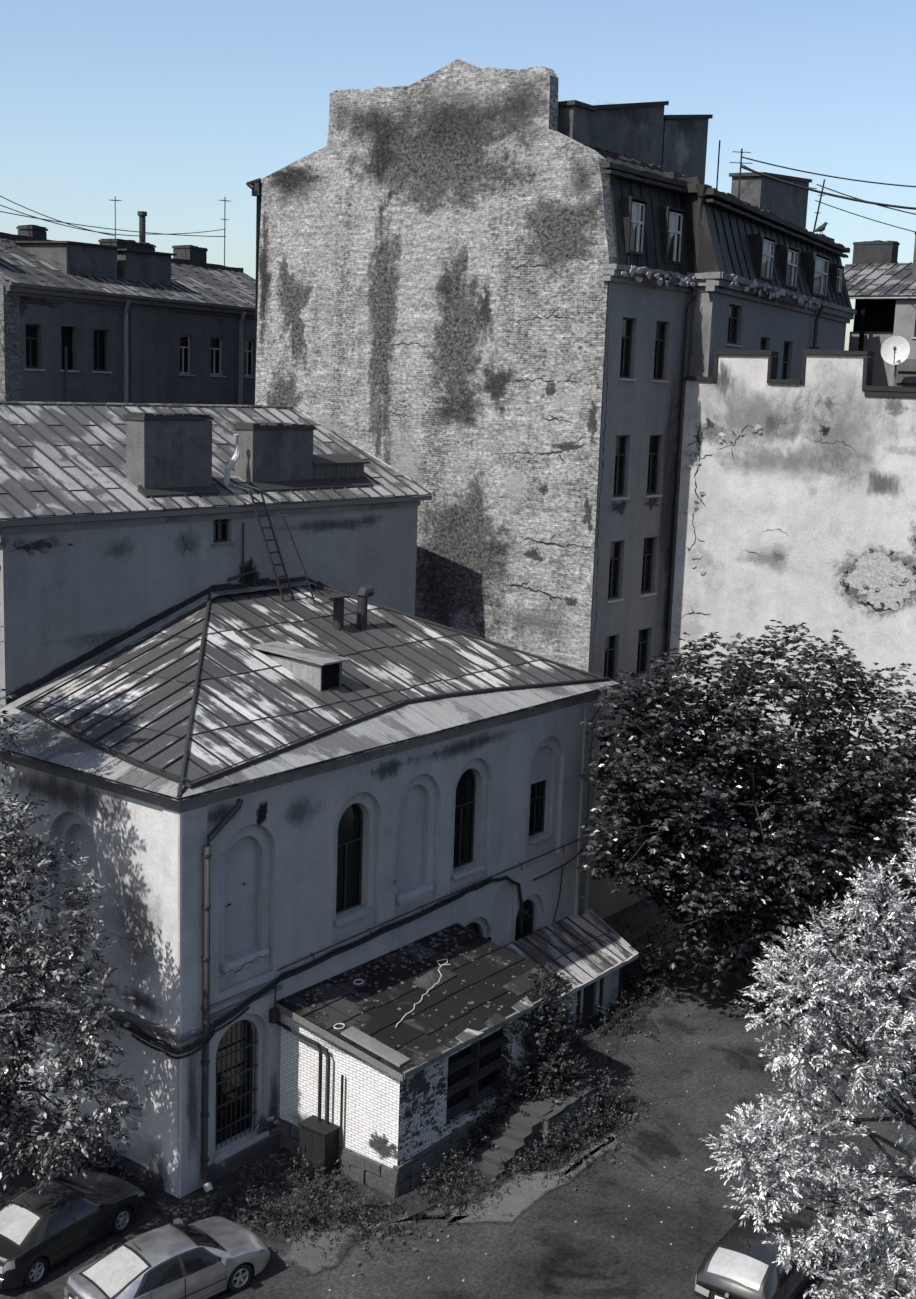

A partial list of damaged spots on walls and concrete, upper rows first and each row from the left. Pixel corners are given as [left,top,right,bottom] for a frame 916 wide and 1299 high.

leakage [352,111,395,183]
leakage [436,274,460,304]
leakage [475,287,493,334]
leakage [436,361,512,426]
crack [687,423,761,552]
spalling [840,527,916,616]
flaking render [403,1070,431,1097]